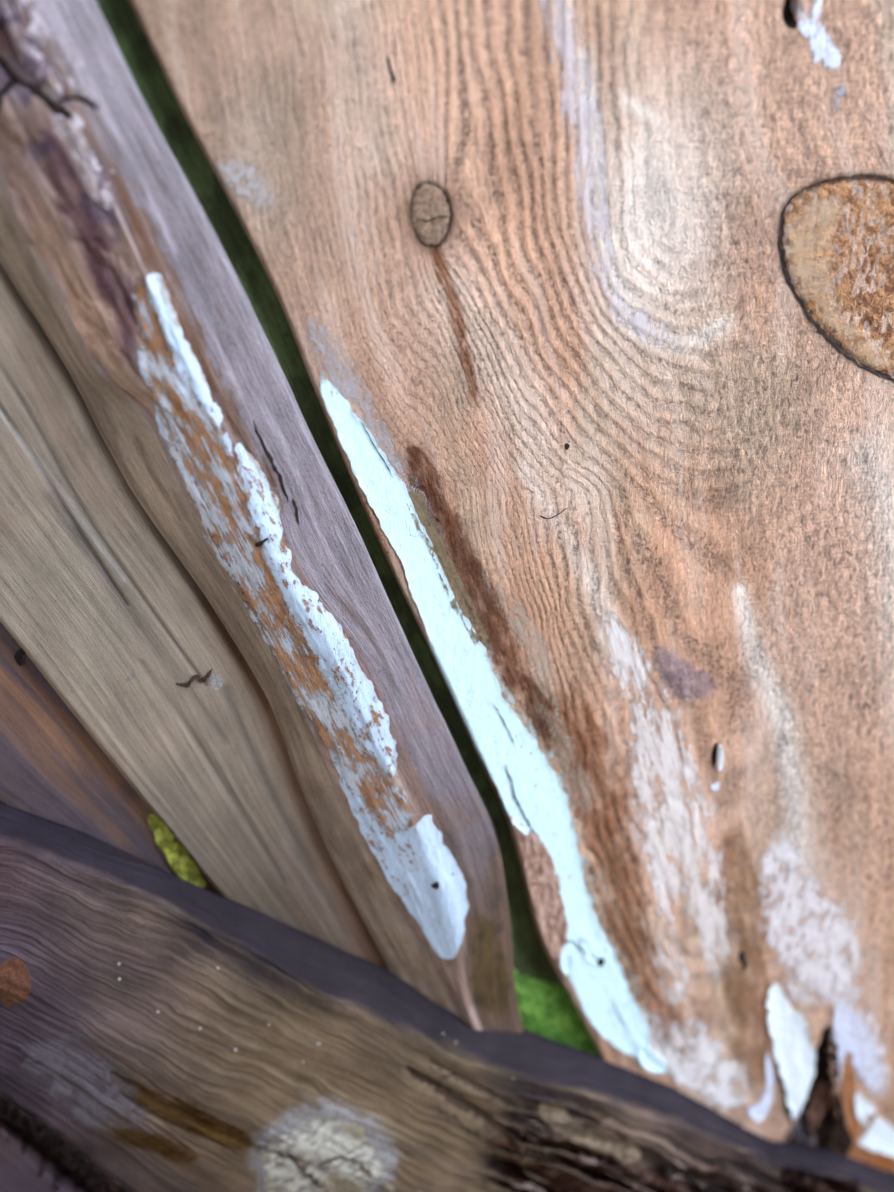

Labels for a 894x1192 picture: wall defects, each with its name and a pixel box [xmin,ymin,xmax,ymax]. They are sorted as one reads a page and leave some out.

crack [0,15,96,119]
peeling [133,273,469,959]
peeling [320,372,680,1077]
peeling [748,983,816,1121]
peeling [828,999,894,1156]